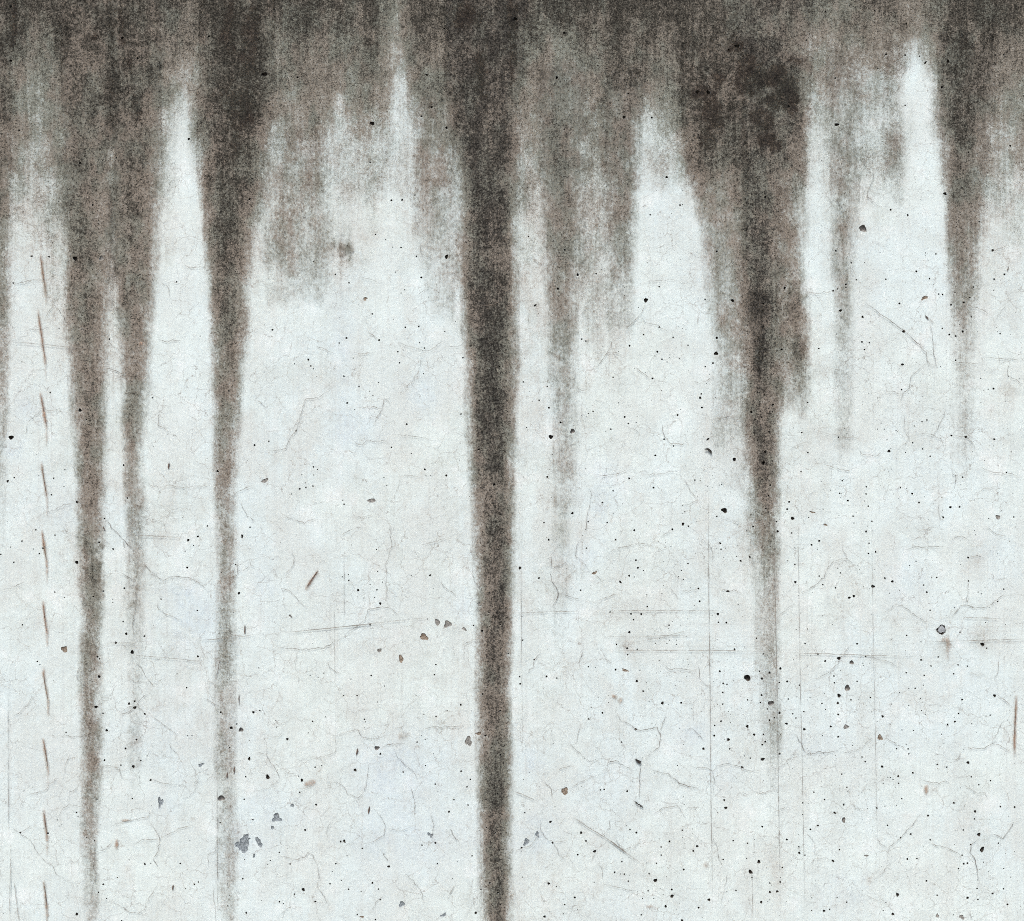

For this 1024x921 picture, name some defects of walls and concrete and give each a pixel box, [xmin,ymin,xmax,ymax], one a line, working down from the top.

water stain [750,107,782,152]
water stain [331,242,353,257]
water stain [776,194,810,406]
water stain [752,341,766,363]